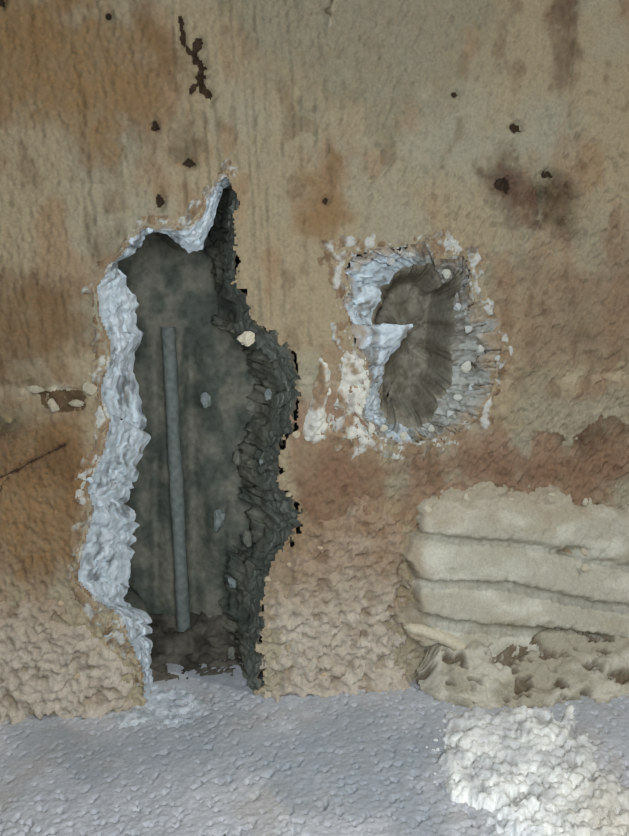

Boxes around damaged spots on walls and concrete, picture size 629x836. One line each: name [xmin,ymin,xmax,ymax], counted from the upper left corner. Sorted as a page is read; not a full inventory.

spalling [0,158,513,725]